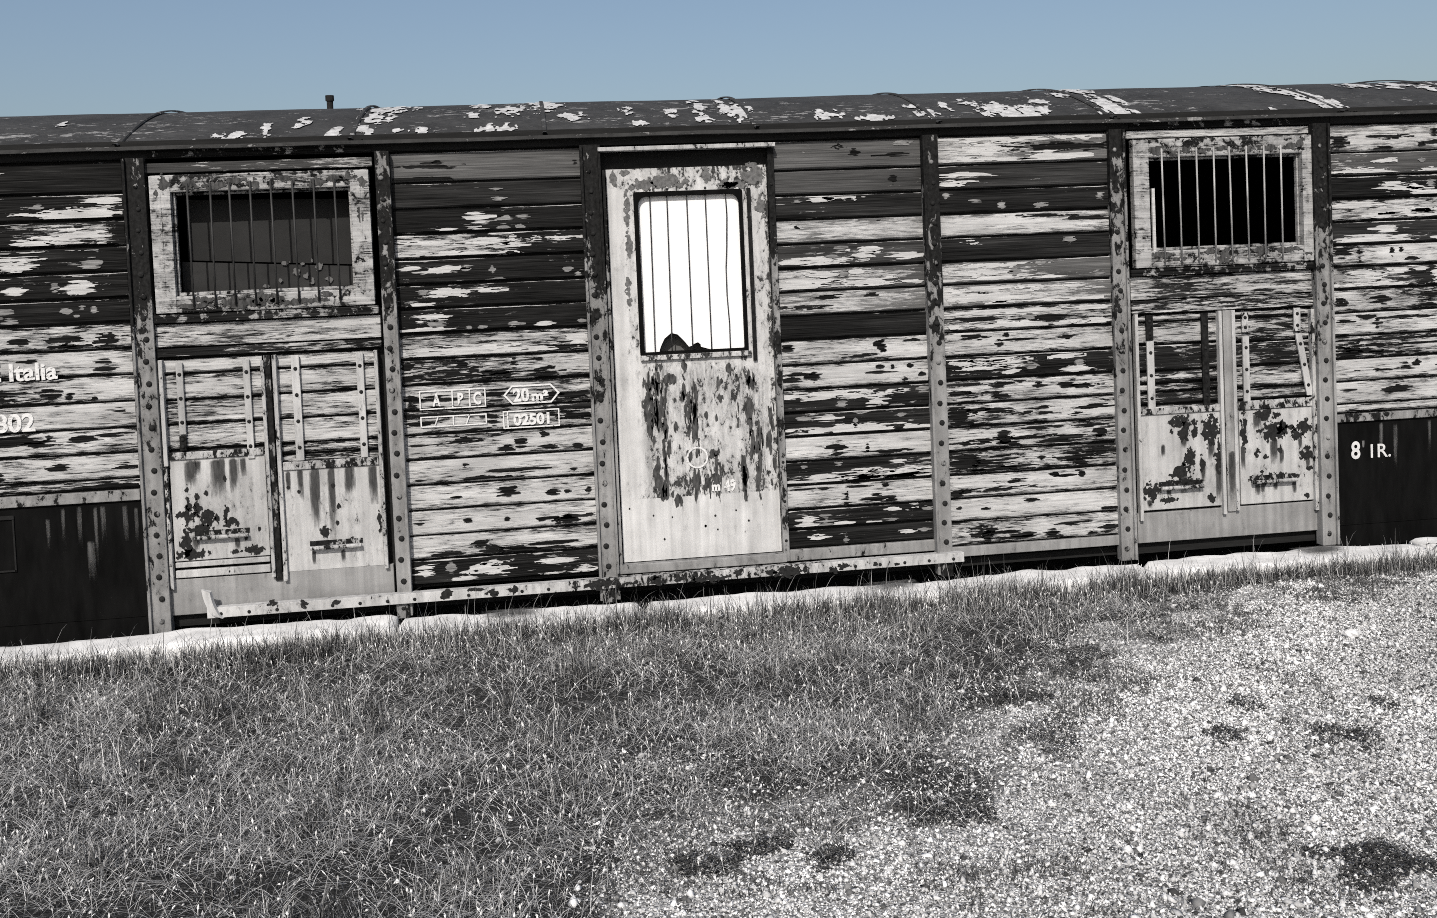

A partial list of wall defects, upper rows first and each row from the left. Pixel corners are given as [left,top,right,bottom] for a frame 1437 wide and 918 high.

peeling [0,197,128,371]
corrosion [175,458,266,560]
peeling [395,188,592,499]
peeling [413,512,742,600]
corrosion [641,355,777,530]
peeling [778,246,924,310]
peeling [783,339,933,543]
peeling [814,89,1141,121]
peeling [938,134,1109,242]
peeling [942,260,1119,542]
corrosion [1143,404,1313,506]
peeling [1330,128,1437,392]